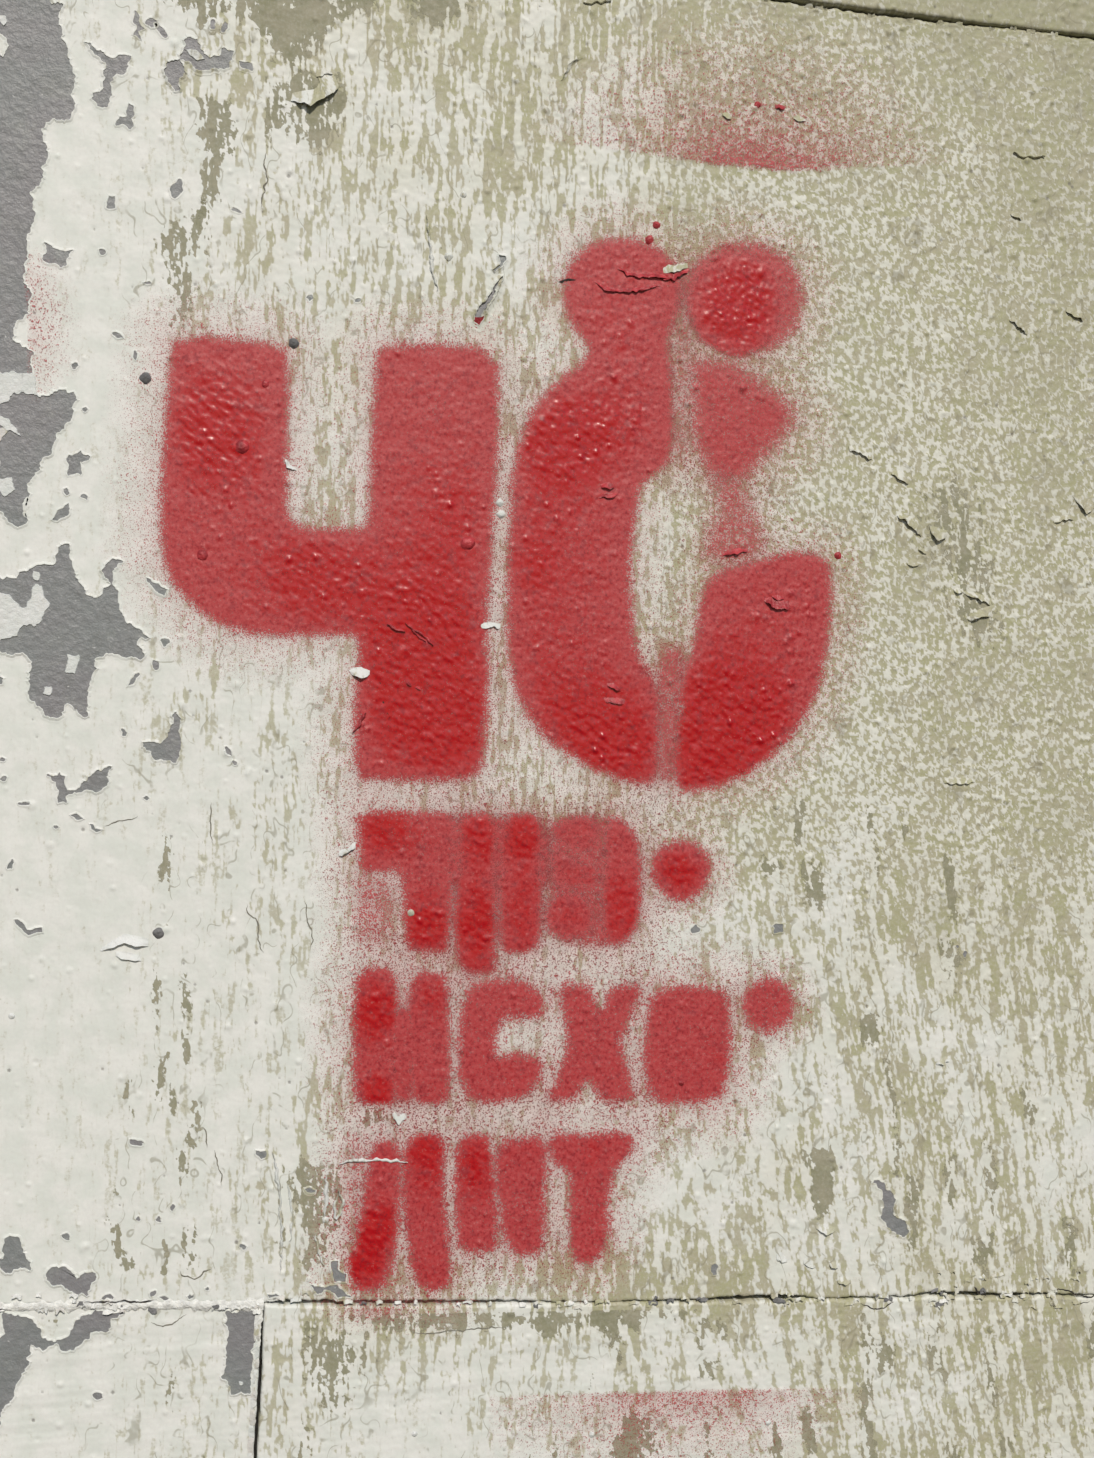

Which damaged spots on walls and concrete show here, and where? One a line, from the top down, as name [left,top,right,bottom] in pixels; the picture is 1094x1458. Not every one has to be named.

peeling [0,0,256,723]
peeling [0,755,9,785]
peeling [44,763,115,836]
peeling [118,709,187,767]
peeling [4,857,17,871]
peeling [133,1202,178,1225]
peeling [870,1175,913,1242]
peeling [0,1230,129,1438]
peeling [147,1257,418,1458]